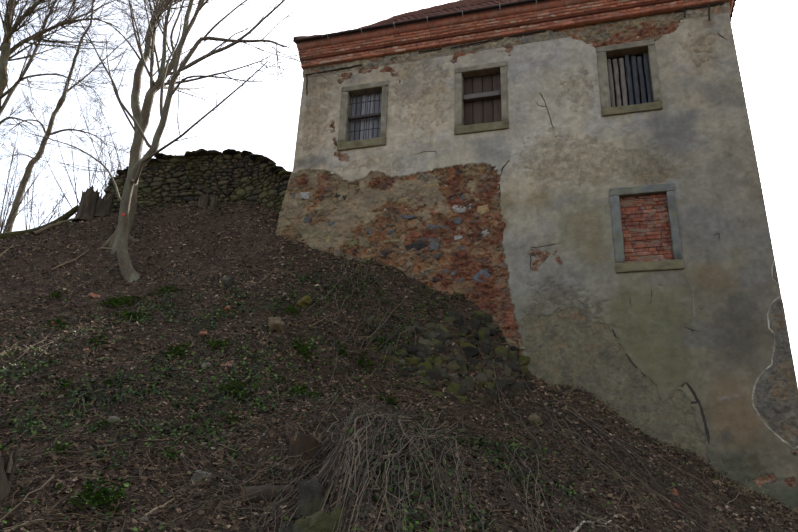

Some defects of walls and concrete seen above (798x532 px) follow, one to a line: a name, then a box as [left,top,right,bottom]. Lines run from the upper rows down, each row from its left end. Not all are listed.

spalling [557,14,720,68]
spalling [276,49,711,467]
peeling [755,299,798,456]